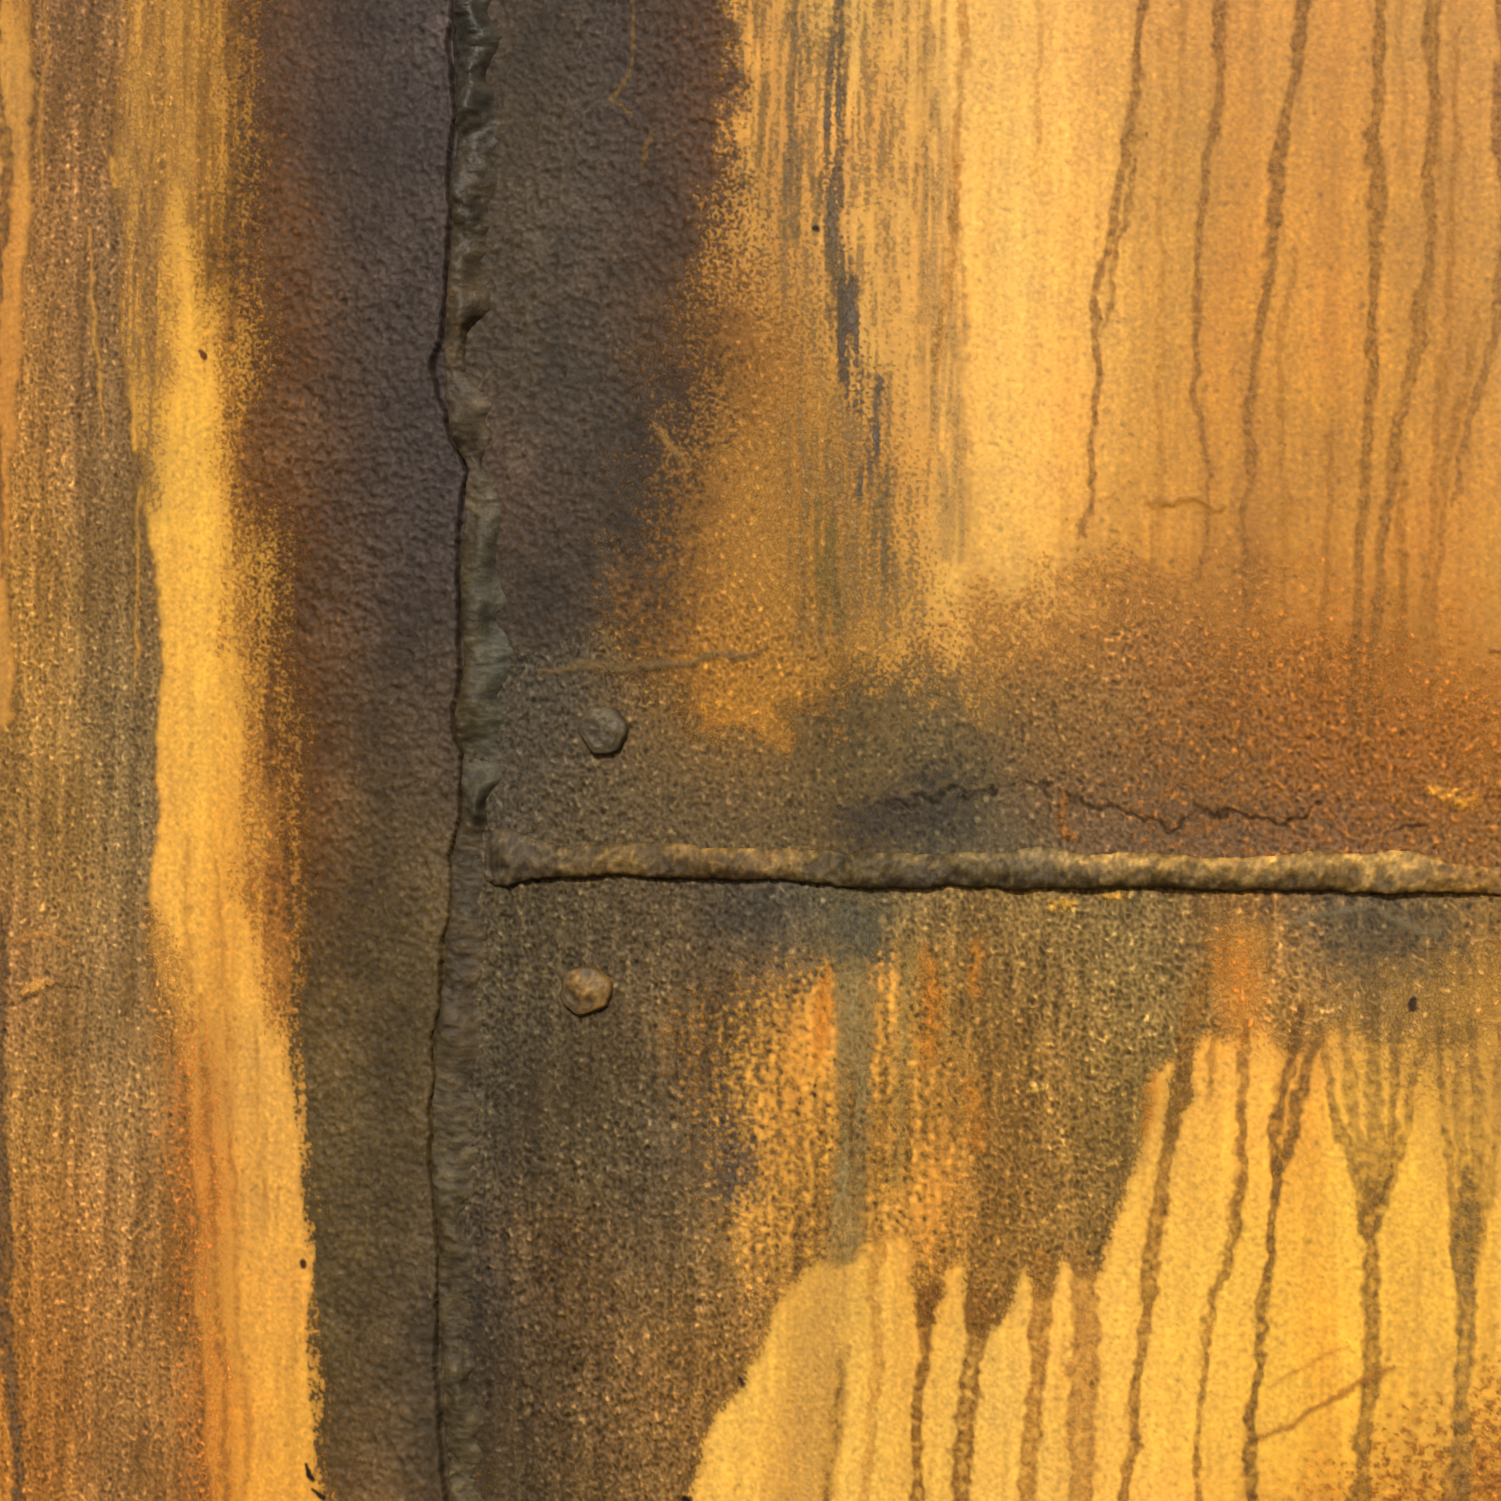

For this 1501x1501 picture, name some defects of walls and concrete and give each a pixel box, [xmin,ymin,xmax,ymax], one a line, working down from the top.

corrosion [910,1473,924,1501]
corrosion [1118,1342,1147,1501]
corrosion [1193,1431,1201,1501]
corrosion [1198,1052,1249,1401]
corrosion [1242,1069,1310,1477]
corrosion [1348,1114,1501,1501]